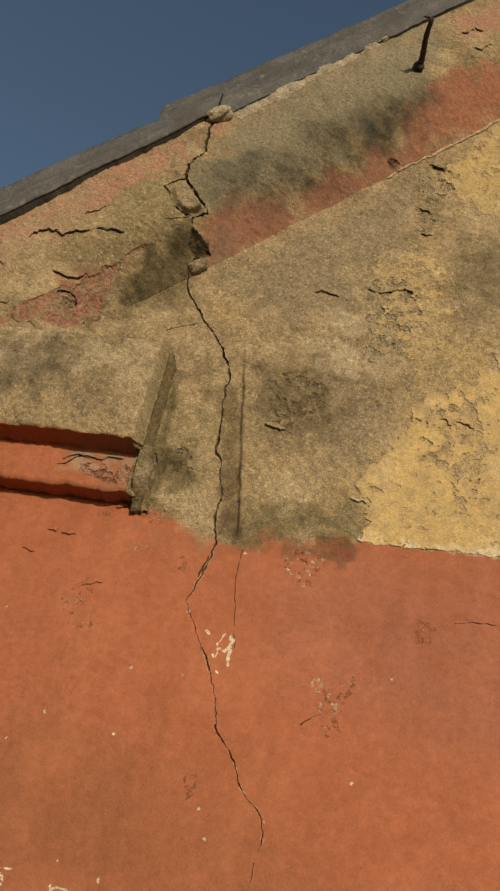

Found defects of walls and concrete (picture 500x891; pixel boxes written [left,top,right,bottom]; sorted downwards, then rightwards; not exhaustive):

crack [163,123,215,220]
peeling [0,244,150,333]
damp [120,230,201,305]
spalling [63,450,136,490]
peeling [350,355,500,558]
crack [165,258,266,891]
spalling [310,676,359,738]